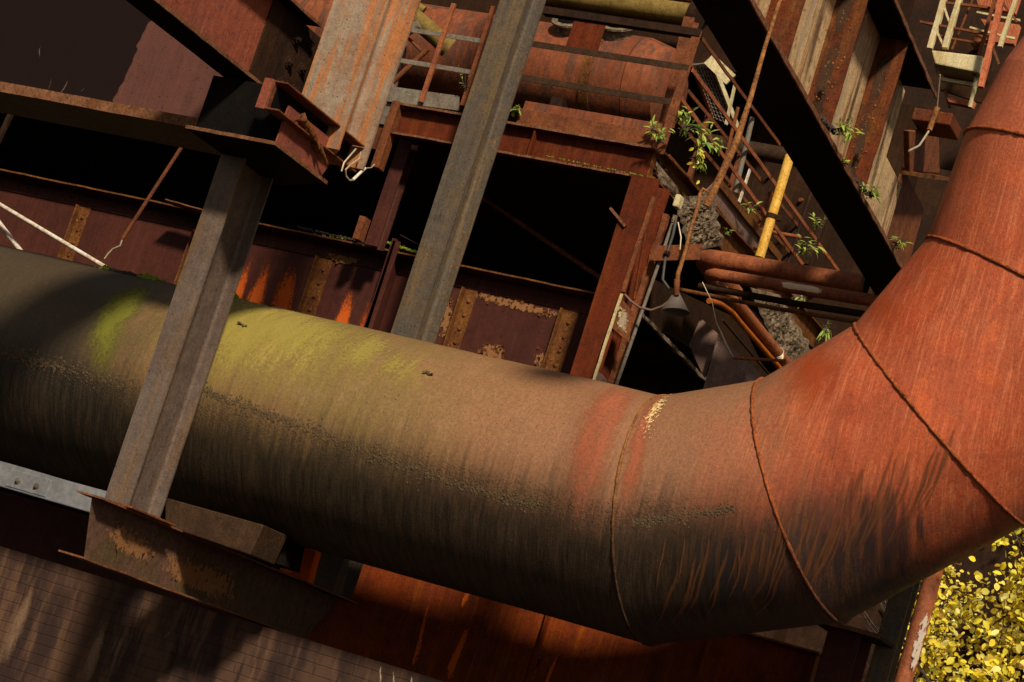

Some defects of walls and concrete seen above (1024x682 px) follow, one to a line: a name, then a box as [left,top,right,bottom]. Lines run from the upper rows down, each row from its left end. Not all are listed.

corrosion [848,52,893,177]
corrosion [236,267,295,310]
corrosion [336,296,371,327]
peeling [474,290,559,318]
peeling [477,342,505,359]
corrosion [544,386,637,510]
corrosion [660,444,949,619]